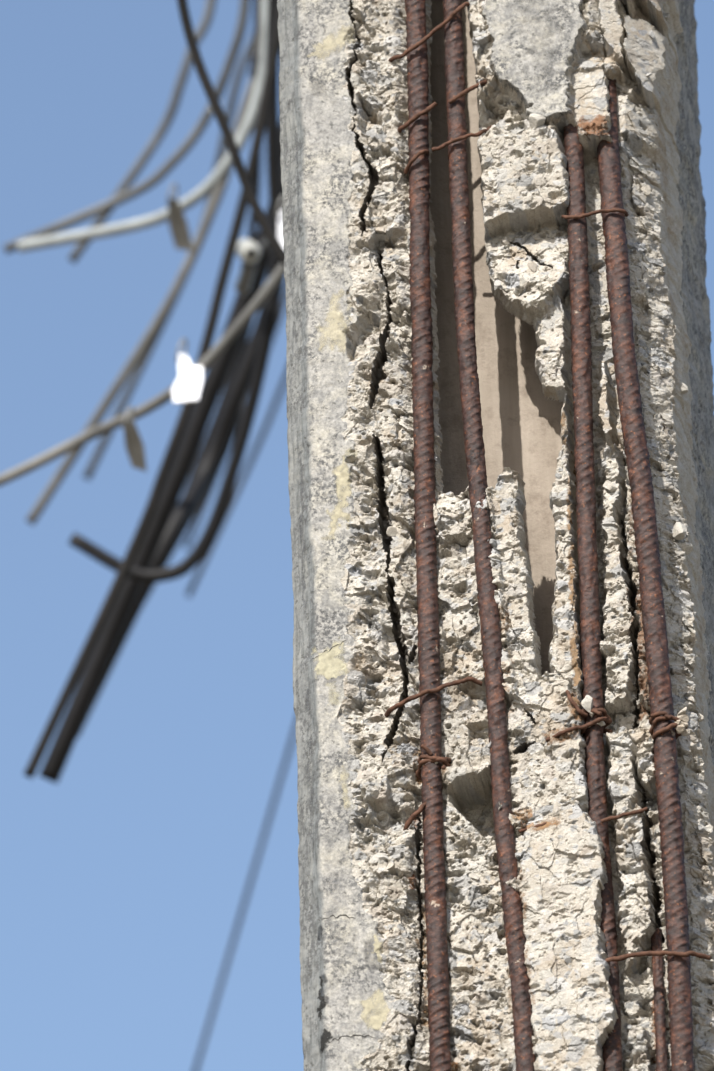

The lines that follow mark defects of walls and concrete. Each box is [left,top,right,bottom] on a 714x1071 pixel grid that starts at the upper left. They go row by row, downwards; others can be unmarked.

corrosion [577,114,609,139]
crack [345,0,417,763]
spalling [337,0,430,1071]
corrosion [544,412,583,744]
spalling [425,0,714,1071]
corrosion [627,589,651,721]
crack [405,814,426,1071]
corrosion [513,809,559,836]